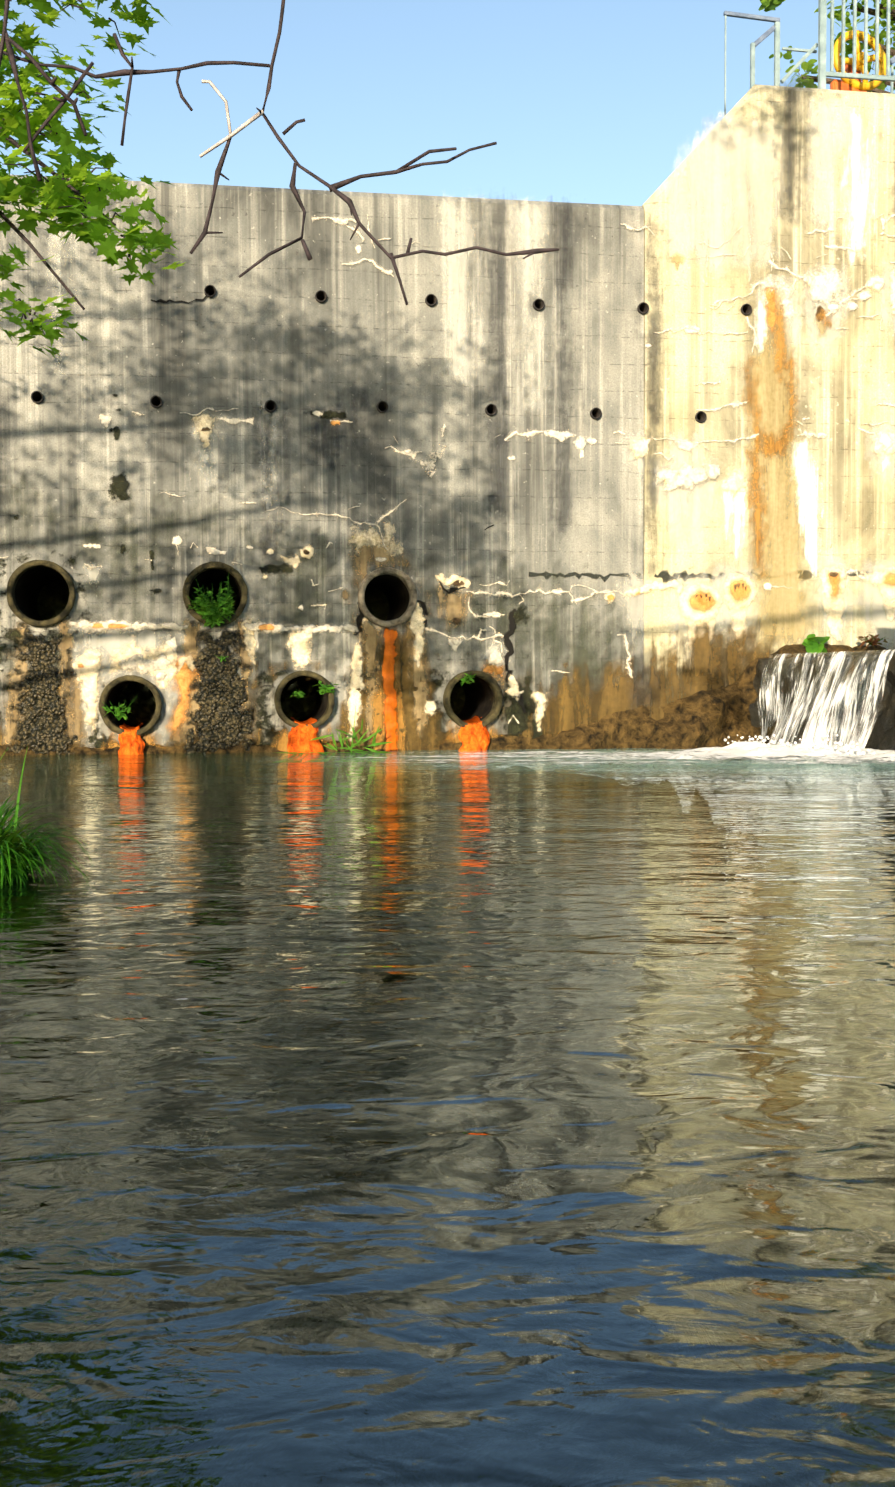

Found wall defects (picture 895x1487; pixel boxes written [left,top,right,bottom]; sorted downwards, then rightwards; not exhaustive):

corrosion [746,287,806,643]
spalling [172,523,403,579]
spalling [299,579,349,610]
leakage [686,623,758,685]
corrosion [372,628,405,751]
corrosion [274,731,288,752]